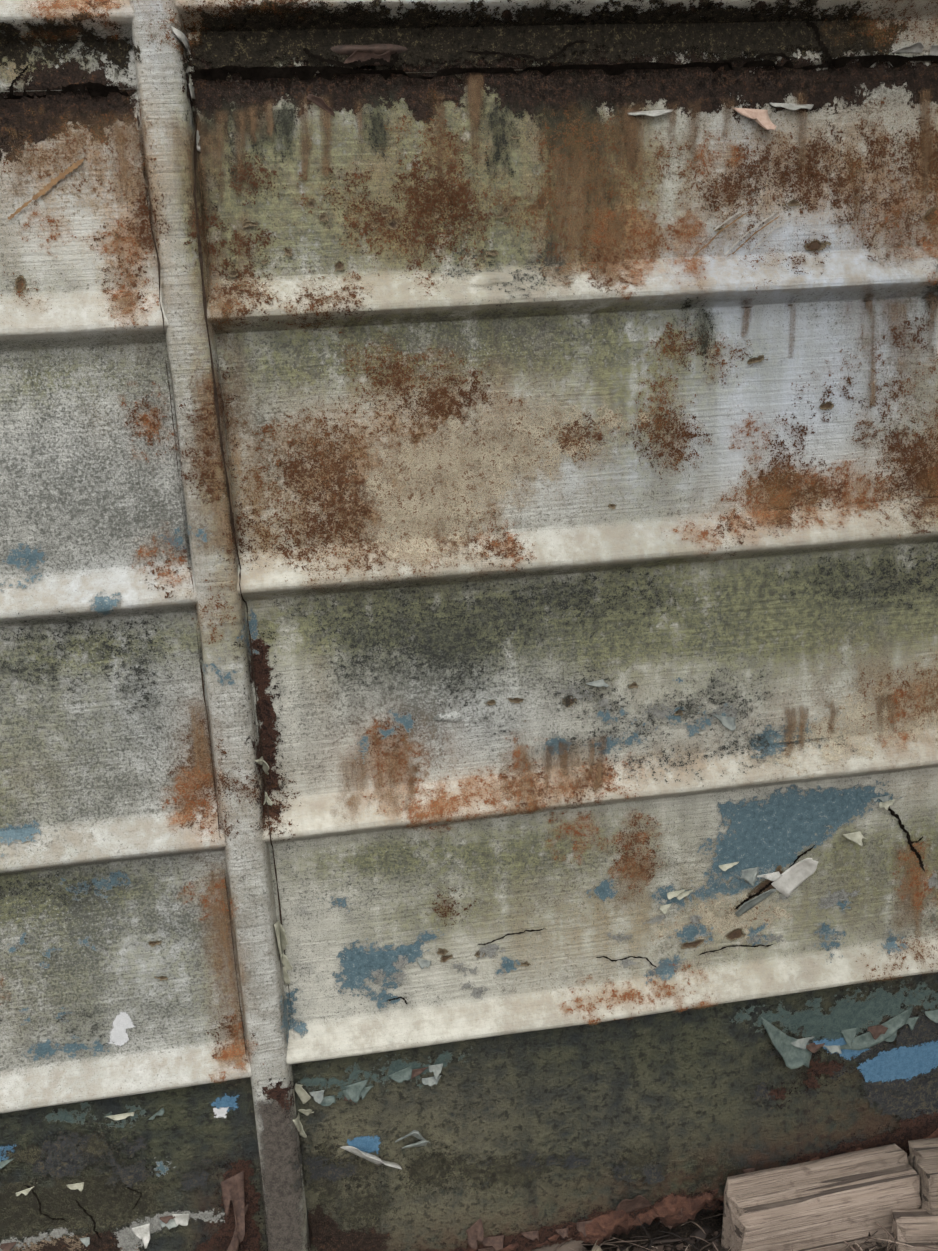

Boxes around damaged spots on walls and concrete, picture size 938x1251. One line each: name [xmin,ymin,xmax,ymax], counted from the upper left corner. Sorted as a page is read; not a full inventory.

peeling [572,0,729,22]
peeling [168,15,938,276]
damp [675,296,716,357]
rust [0,75,938,843]
crack [193,21,938,954]
rust [342,711,670,904]
peeling [843,831,867,846]
peeling [0,1102,248,1251]
peeling [293,1046,473,1251]